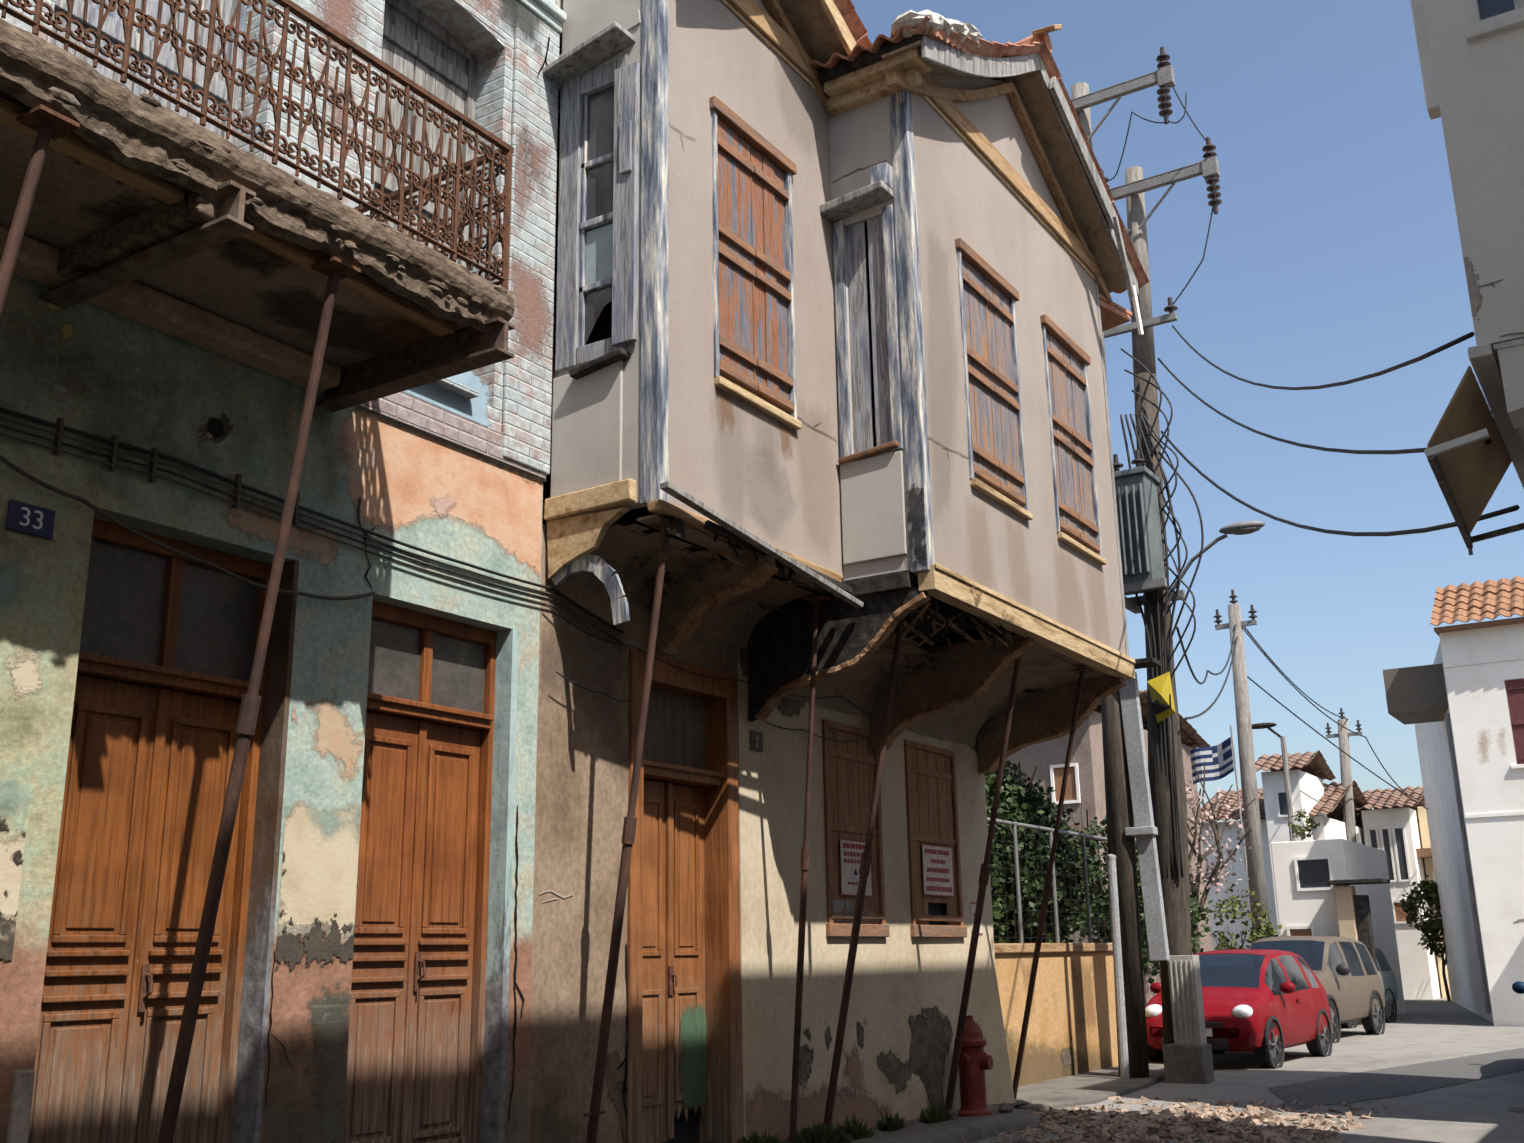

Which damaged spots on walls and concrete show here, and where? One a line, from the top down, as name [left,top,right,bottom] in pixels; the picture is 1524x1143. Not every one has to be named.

flaking render [513,122,551,234]
leakage [218,241,423,354]
flaking render [511,252,554,366]
peeling [226,499,339,565]
peeling [341,410,543,577]
peeling [291,689,364,781]
peeling [0,782,26,962]
peeling [275,800,361,971]
crack [508,805,558,1121]
peeling [745,1006,953,1142]